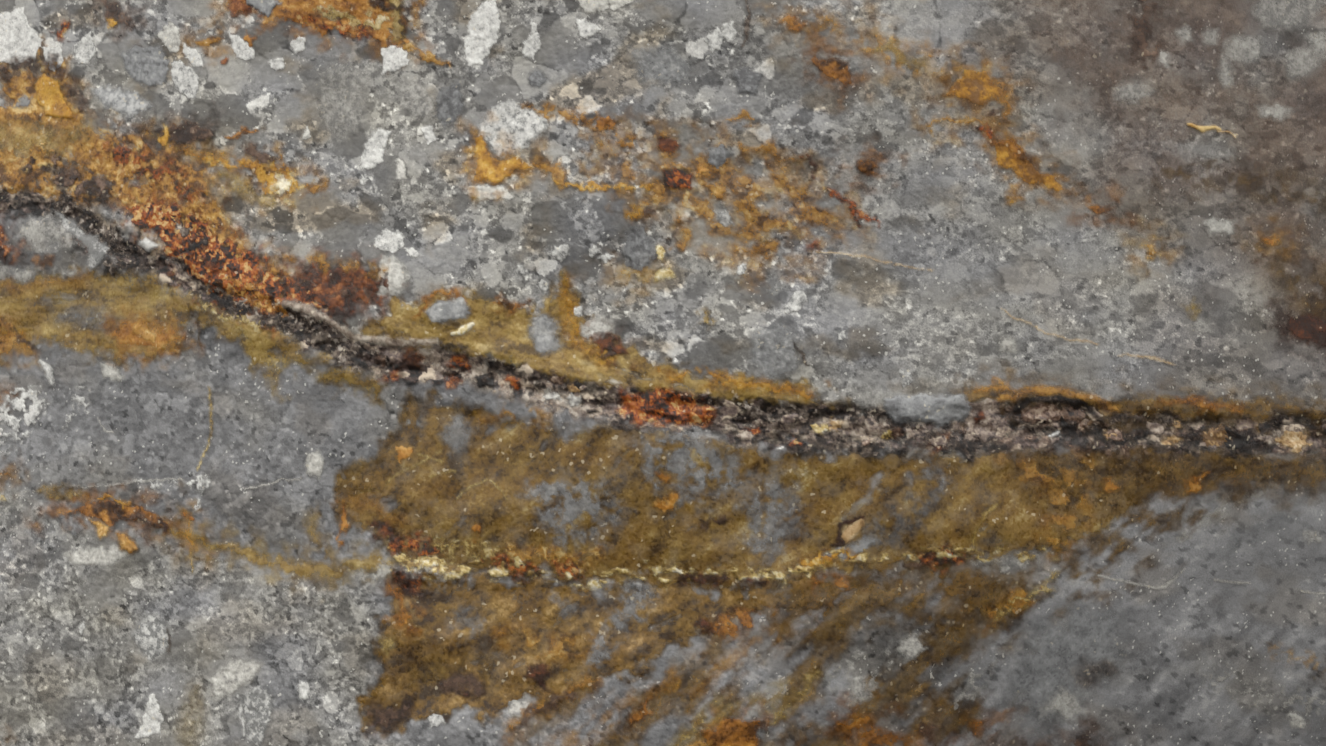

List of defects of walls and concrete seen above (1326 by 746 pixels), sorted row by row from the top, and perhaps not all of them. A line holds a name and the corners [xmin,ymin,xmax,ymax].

rust [0,21,388,323]
rust [465,103,879,260]
rust [927,62,1065,203]
damp [0,269,383,403]
crack [0,188,1326,462]
crack [21,388,213,492]
rust [37,485,393,581]
crack [245,477,302,490]
crack [351,480,1045,595]
damp [595,620,737,746]
rust [675,673,815,746]
damp [750,595,993,746]